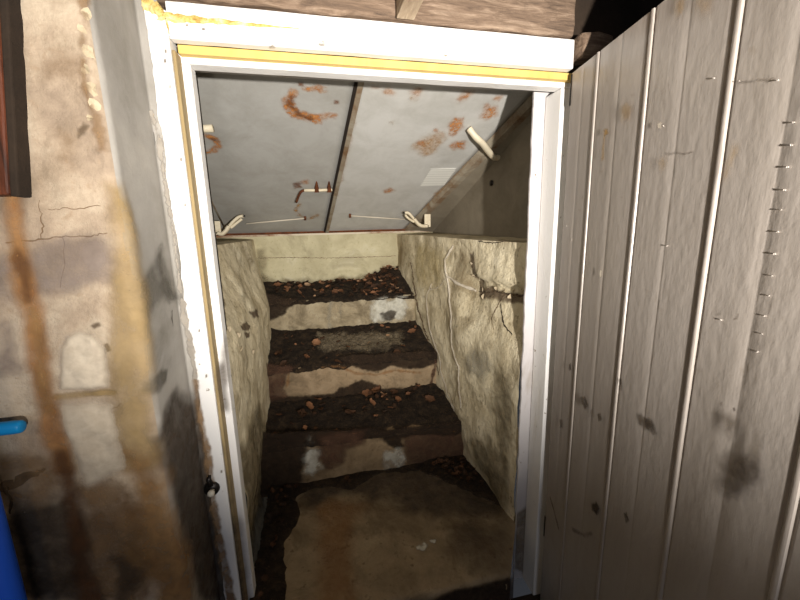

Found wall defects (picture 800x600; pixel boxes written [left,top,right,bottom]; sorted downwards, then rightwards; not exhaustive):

rust [284,83,336,124]
rust [449,118,464,148]
crack [5,200,107,288]
crack [473,276,513,334]